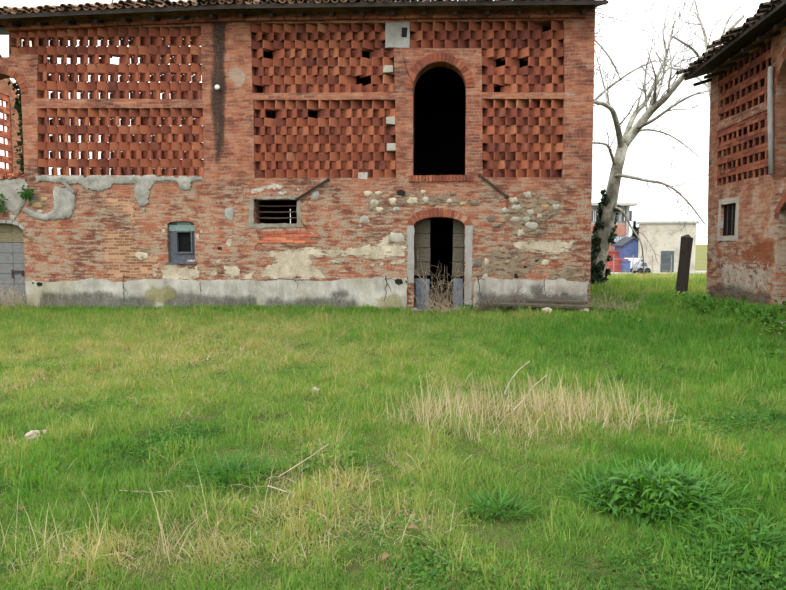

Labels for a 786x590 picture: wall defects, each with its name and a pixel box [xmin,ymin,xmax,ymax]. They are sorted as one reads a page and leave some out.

leakage [212,22,226,157]
peeling [0,174,203,221]